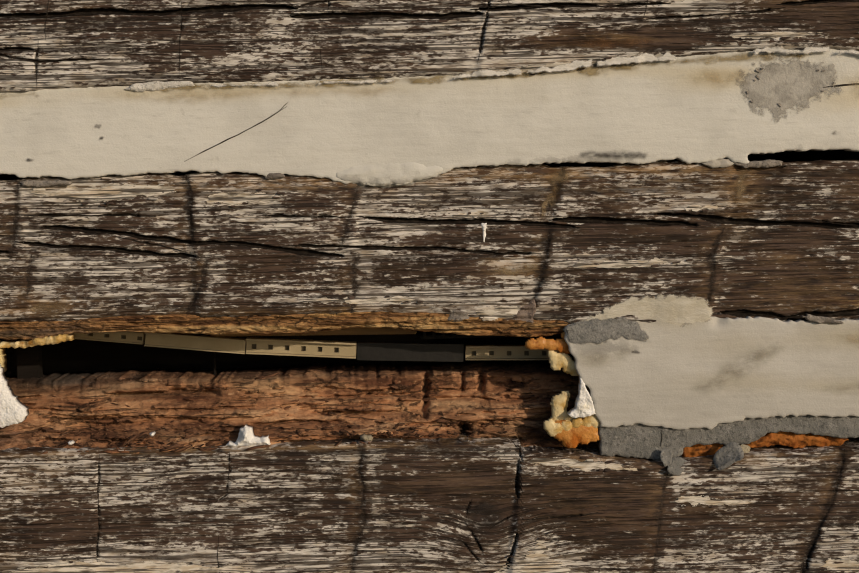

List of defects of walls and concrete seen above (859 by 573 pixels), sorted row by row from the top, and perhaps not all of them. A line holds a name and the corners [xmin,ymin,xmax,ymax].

crack [0,0,859,82]
spalling [737,56,842,122]
crack [0,103,859,321]
spalling [529,415,859,476]